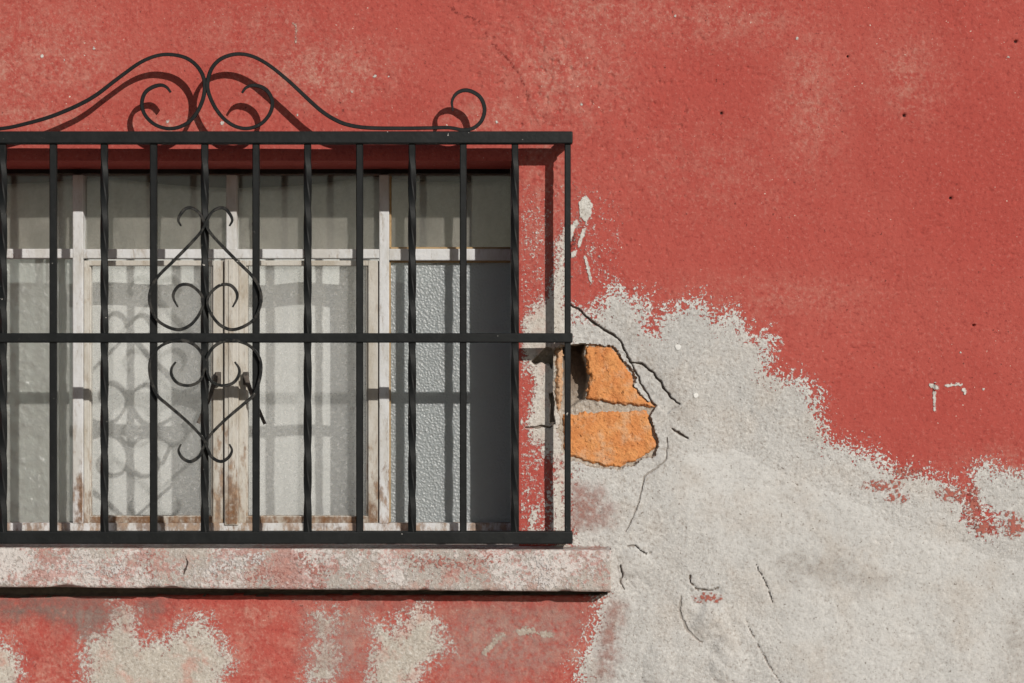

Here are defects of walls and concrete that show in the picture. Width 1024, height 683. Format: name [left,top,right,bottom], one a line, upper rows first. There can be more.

crack [571,305,680,405]
crack [525,393,556,429]
peeling [521,191,1024,683]
peeling [0,630,27,683]
peeling [71,598,240,683]
peeling [297,595,460,683]
peeling [482,626,555,657]
crack [746,621,781,683]